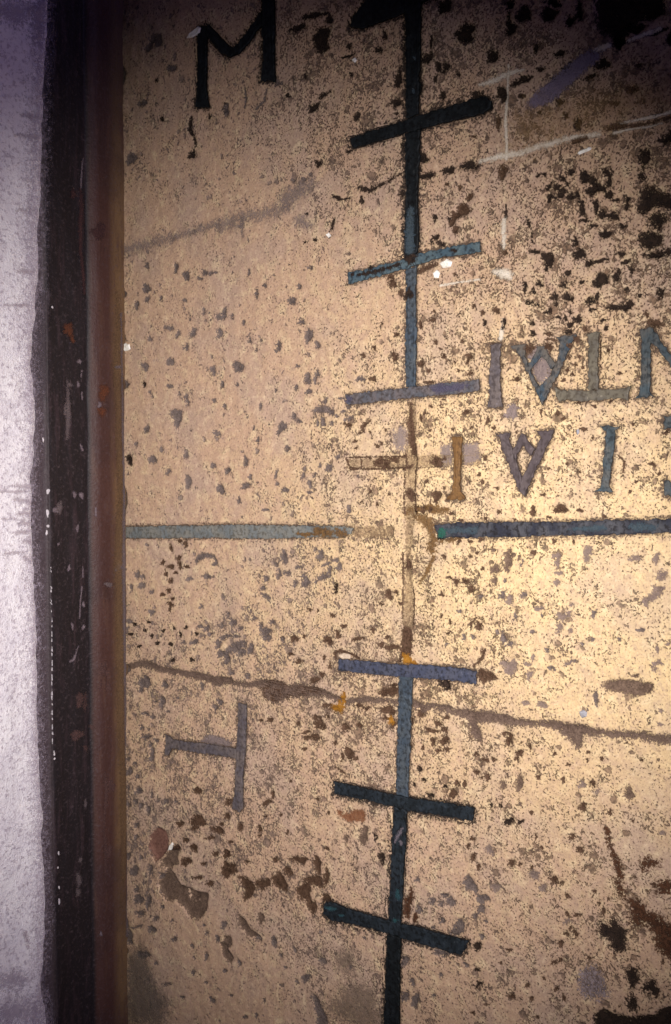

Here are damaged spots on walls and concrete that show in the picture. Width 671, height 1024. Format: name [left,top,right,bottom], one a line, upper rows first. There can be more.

crack [128,659,671,751]